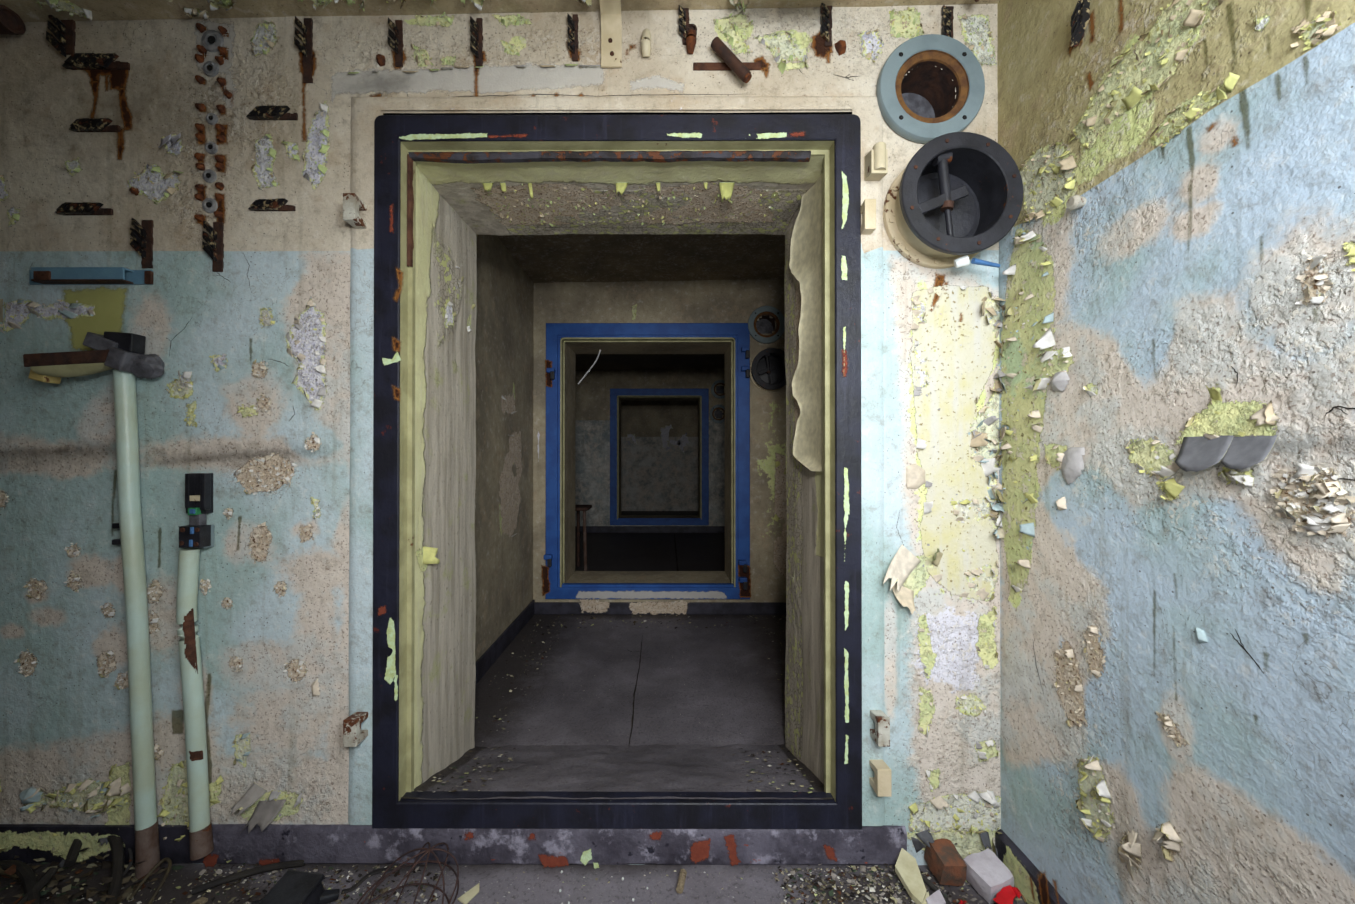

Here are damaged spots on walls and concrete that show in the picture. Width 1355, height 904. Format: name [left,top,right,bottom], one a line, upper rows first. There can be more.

corrosion [811,32,833,63]
corrosion [83,70,133,160]
corrosion [195,21,236,173]
corrosion [299,50,317,141]
peeling [1149,72,1240,147]
corrosion [196,186,225,226]
peeling [1295,254,1333,306]
peeling [883,0,1224,737]
peeling [1124,384,1280,502]
peeling [1270,462,1355,541]
peeling [0,761,132,868]
peeling [1075,755,1183,881]